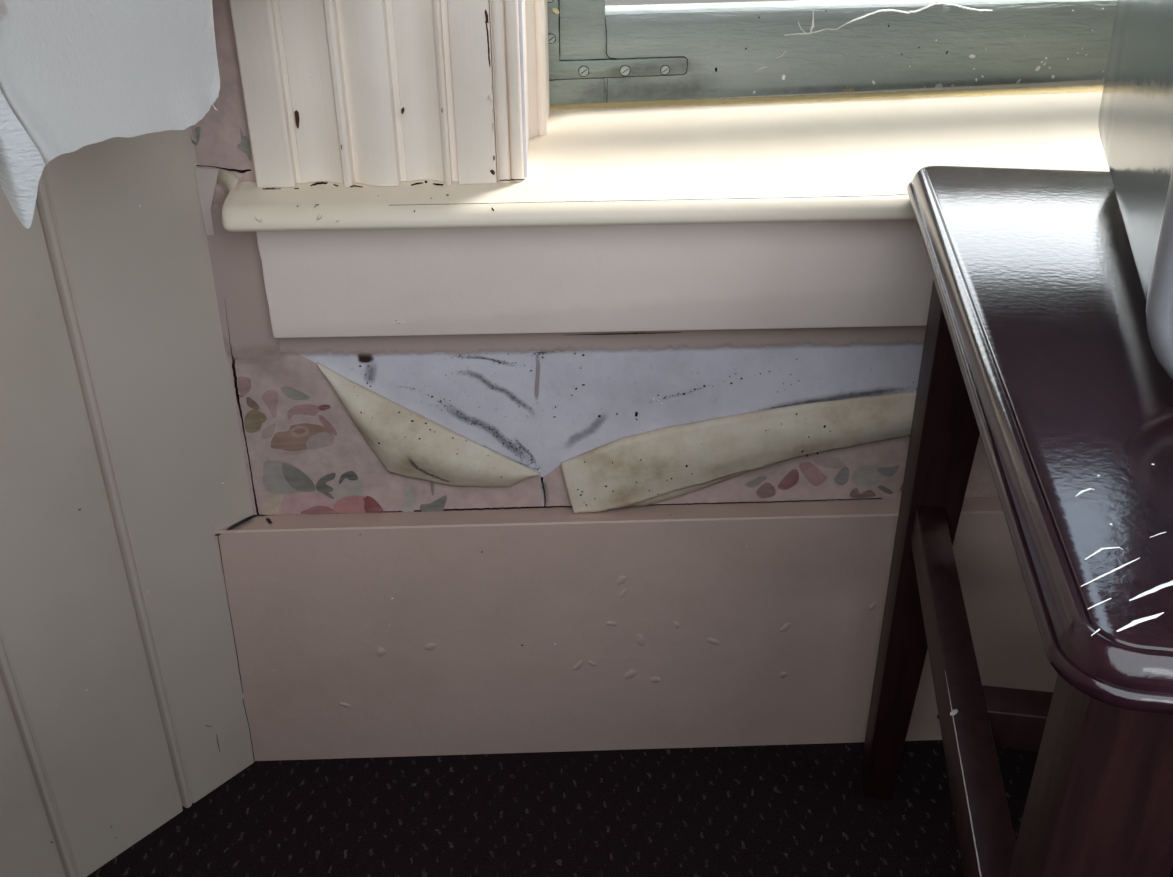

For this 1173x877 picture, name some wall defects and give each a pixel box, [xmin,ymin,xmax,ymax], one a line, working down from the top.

damp [428,386,538,470]
flaking render [298,343,924,481]